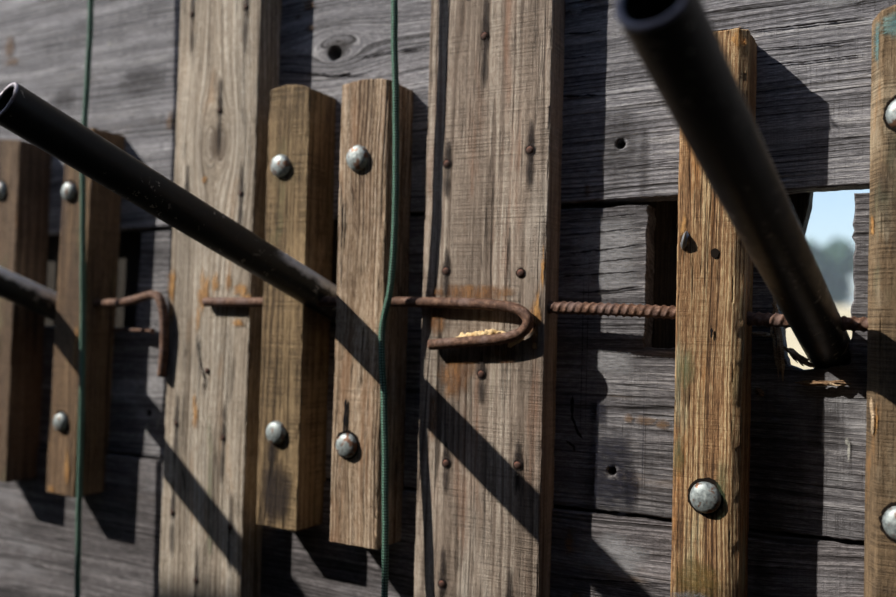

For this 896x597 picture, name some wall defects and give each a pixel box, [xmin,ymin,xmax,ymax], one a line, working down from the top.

rust [93,290,169,377]
rust [202,297,263,307]
rust [390,285,536,393]
rust [547,300,676,320]
rust [747,311,790,328]
rust [841,316,868,333]